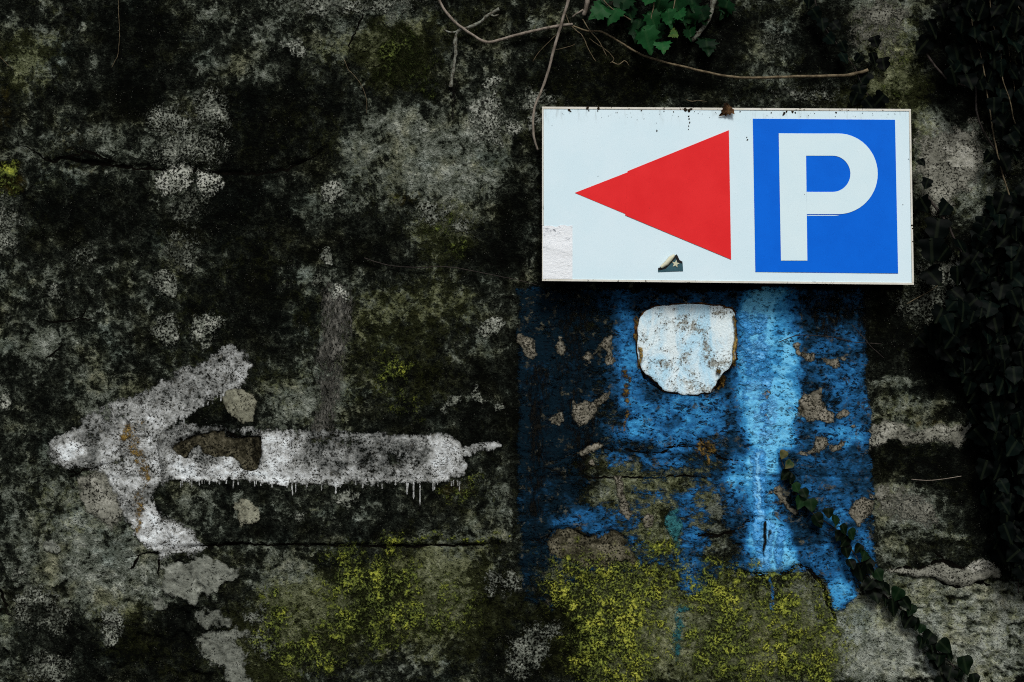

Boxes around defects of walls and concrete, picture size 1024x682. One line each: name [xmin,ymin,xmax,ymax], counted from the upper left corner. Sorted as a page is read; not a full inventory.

crack [19,145,326,176]
spalling [516,333,537,360]
spalling [548,391,611,426]
spalling [798,386,856,428]
spalling [799,436,846,456]
flaking render [849,484,939,528]
crack [126,552,160,575]
crack [201,527,608,553]
spalling [547,527,639,569]
water stain [671,605,693,660]